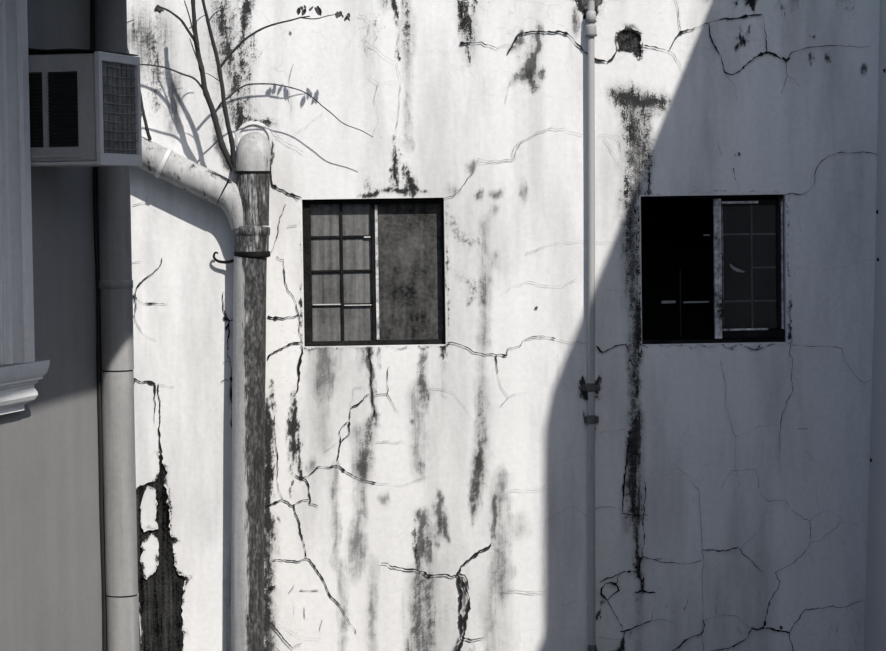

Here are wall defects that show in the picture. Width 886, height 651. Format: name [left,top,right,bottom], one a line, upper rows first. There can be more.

damp [212,0,273,157]
damp [457,0,478,62]
damp [509,25,545,94]
crack [460,30,617,62]
spalling [575,0,603,20]
spalling [614,25,644,61]
crack [267,166,303,393]
damp [609,86,671,589]
spalling [136,451,192,651]
damp [264,379,303,651]
crack [265,347,429,633]
crack [386,521,502,651]